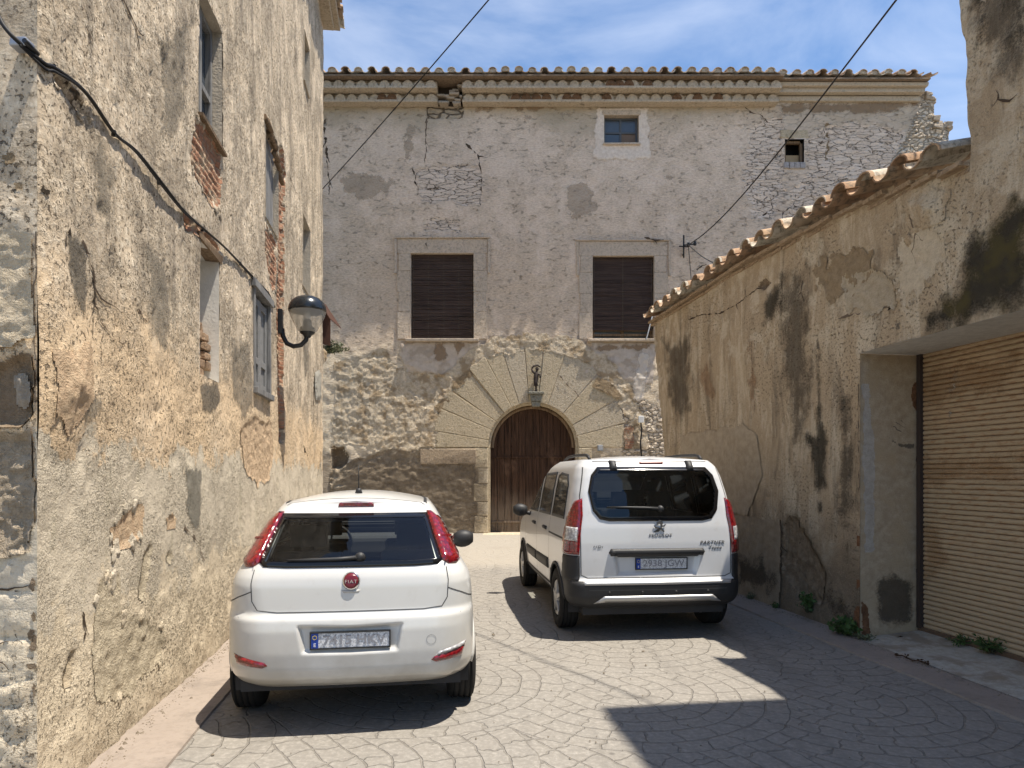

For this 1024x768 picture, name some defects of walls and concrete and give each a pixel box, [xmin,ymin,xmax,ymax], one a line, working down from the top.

spalling [190,111,223,221]
crack [412,118,486,205]
spalling [0,226,35,427]
peeling [240,143,286,488]
leakage [664,340,691,416]
crack [688,283,771,320]
leakage [765,272,827,489]
peeling [812,226,946,319]
leakage [925,194,1024,332]
leakage [837,447,854,527]
peeling [91,499,165,707]
leakage [877,574,912,623]